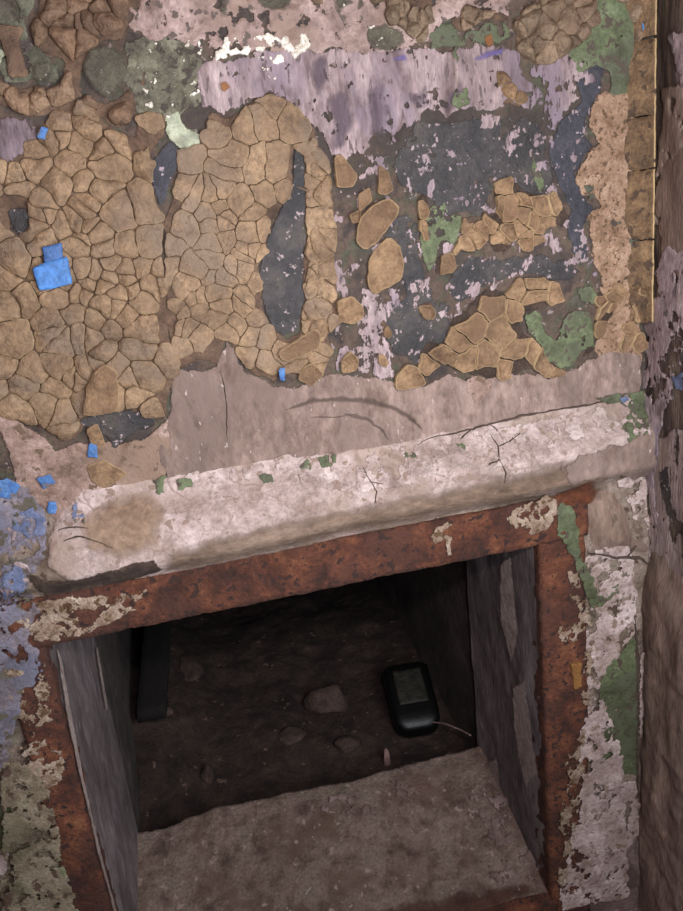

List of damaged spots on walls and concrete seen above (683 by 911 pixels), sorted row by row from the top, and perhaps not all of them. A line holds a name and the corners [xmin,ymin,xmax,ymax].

flaking render [0,0,683,596]
crack [418,401,602,482]
rust [551,482,597,505]
peeling [0,566,147,911]
rust [400,886,531,911]
peeling [506,495,645,911]